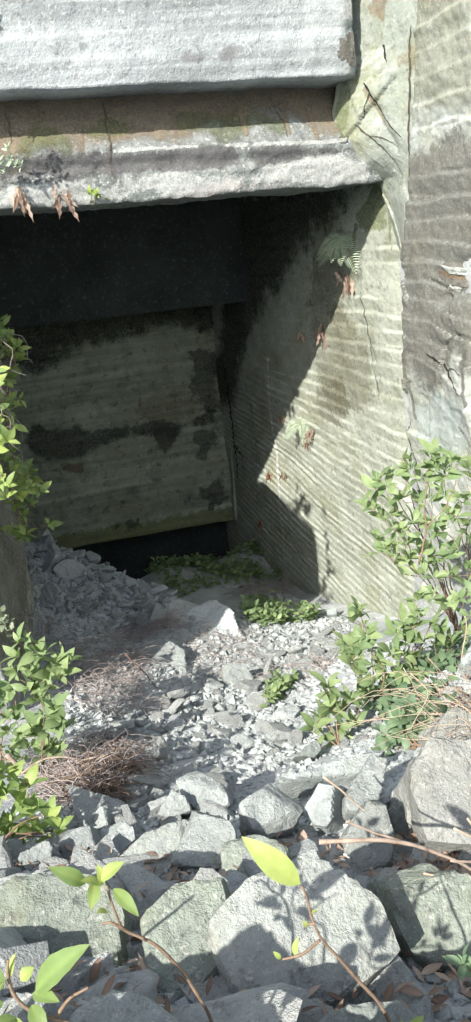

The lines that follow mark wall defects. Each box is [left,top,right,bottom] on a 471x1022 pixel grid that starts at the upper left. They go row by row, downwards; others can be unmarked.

crack [101,101,114,179]
crack [354,27,411,192]
water stain [0,185,359,461]
water stain [400,127,471,449]
water stain [27,419,181,473]